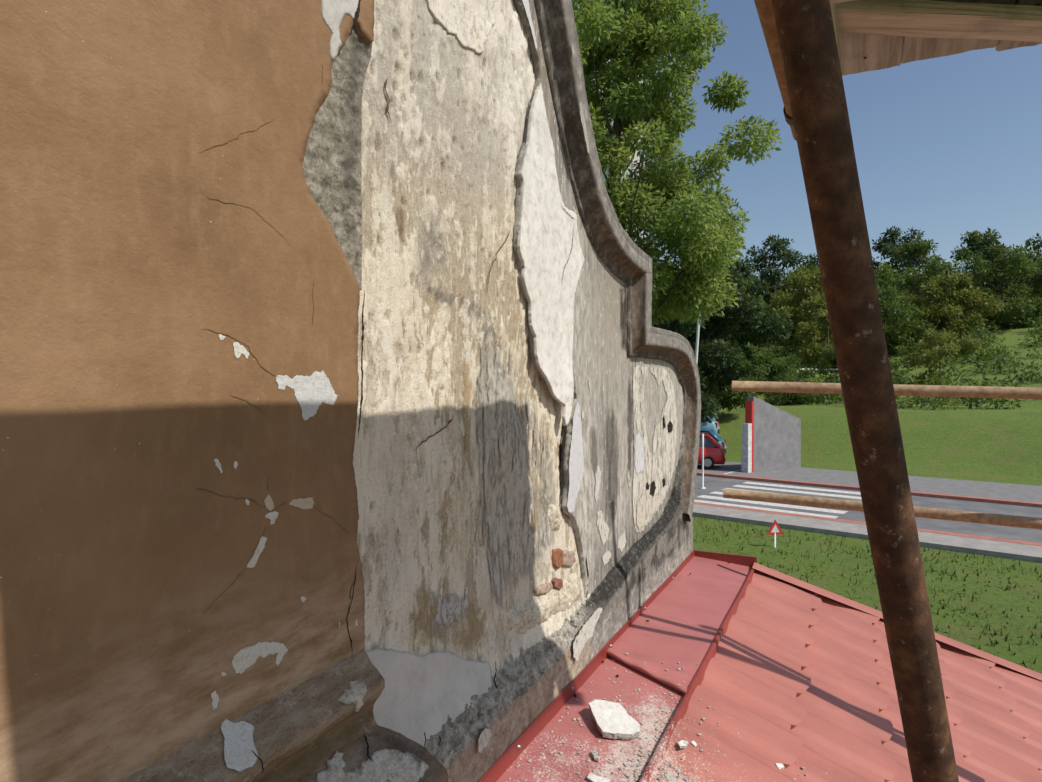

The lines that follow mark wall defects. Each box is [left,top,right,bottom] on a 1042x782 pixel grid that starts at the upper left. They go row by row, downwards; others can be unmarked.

crack [353,0,361,25]
crack [199,119,274,153]
spalling [302,0,372,290]
flaking render [517,83,678,565]
peeling [276,370,339,427]
flaking render [533,548,576,595]
crack [346,566,357,652]
peeling [221,641,288,676]
spalling [315,603,603,782]
peeling [221,719,259,772]